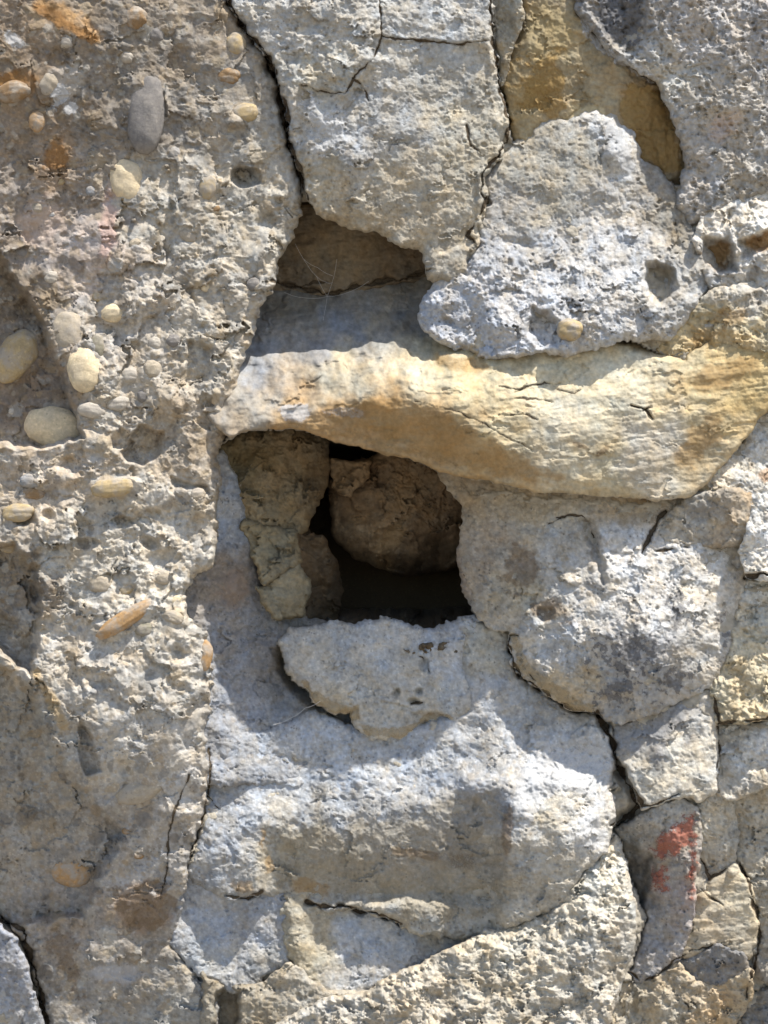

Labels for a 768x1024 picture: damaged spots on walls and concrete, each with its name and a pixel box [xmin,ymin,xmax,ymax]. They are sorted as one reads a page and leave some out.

crack [228,0,512,243]
crack [642,510,688,553]
crack [162,748,219,889]
crack [226,890,264,900]
crack [304,899,402,925]
crack [0,916,50,1024]